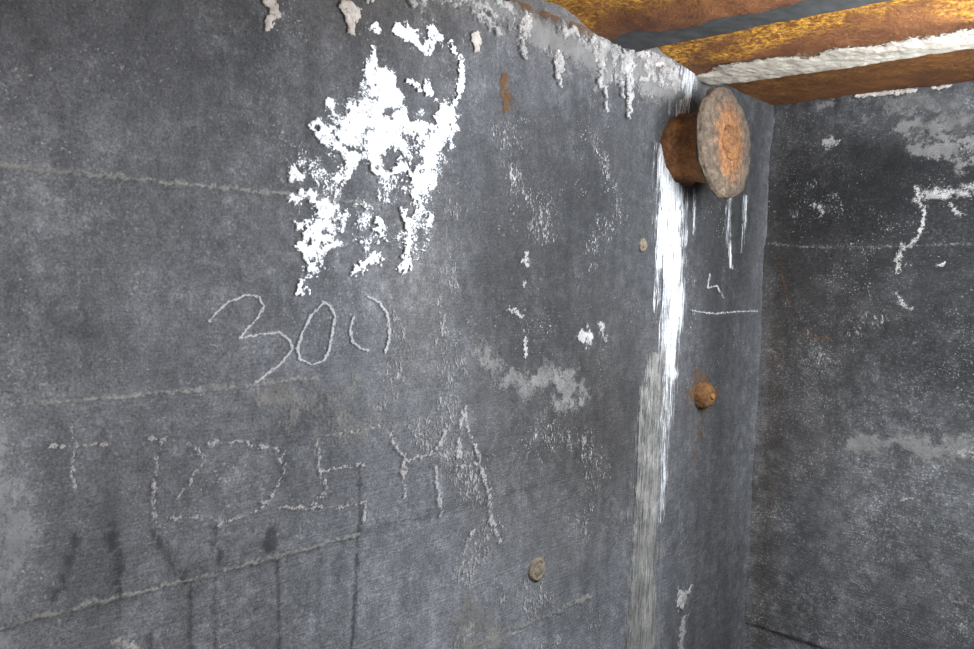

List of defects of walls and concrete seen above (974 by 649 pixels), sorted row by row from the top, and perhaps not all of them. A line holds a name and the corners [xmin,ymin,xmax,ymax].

leakage [255,19,611,508]
efflorescence [625,148,696,649]